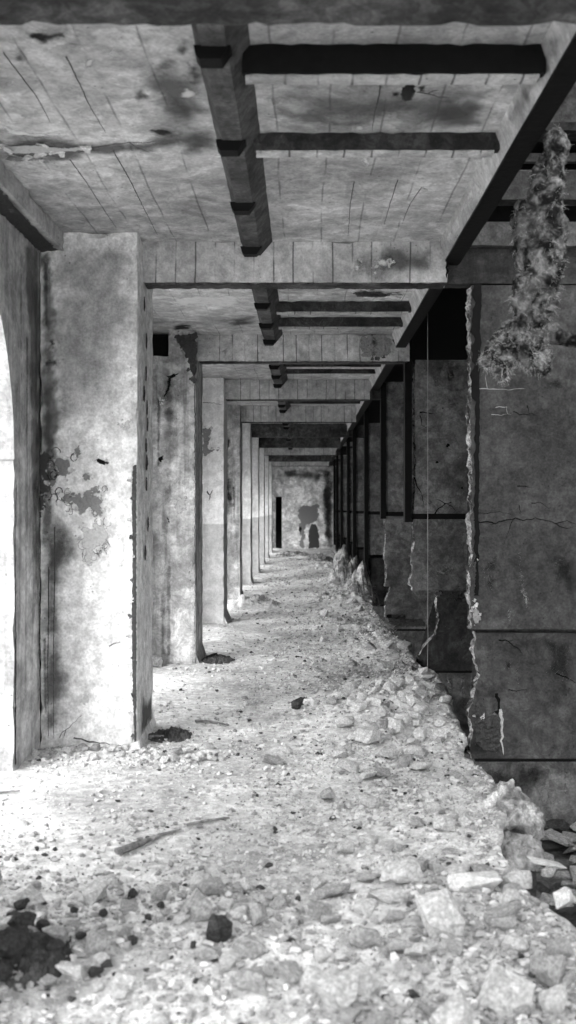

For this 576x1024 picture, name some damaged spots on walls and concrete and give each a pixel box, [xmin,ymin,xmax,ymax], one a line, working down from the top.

leakage [280,87,480,129]
peeling [0,143,92,166]
peeling [39,445,112,566]
spalling [127,332,198,742]
peeling [297,504,319,548]
crack [413,477,575,543]
spalling [472,699,501,752]